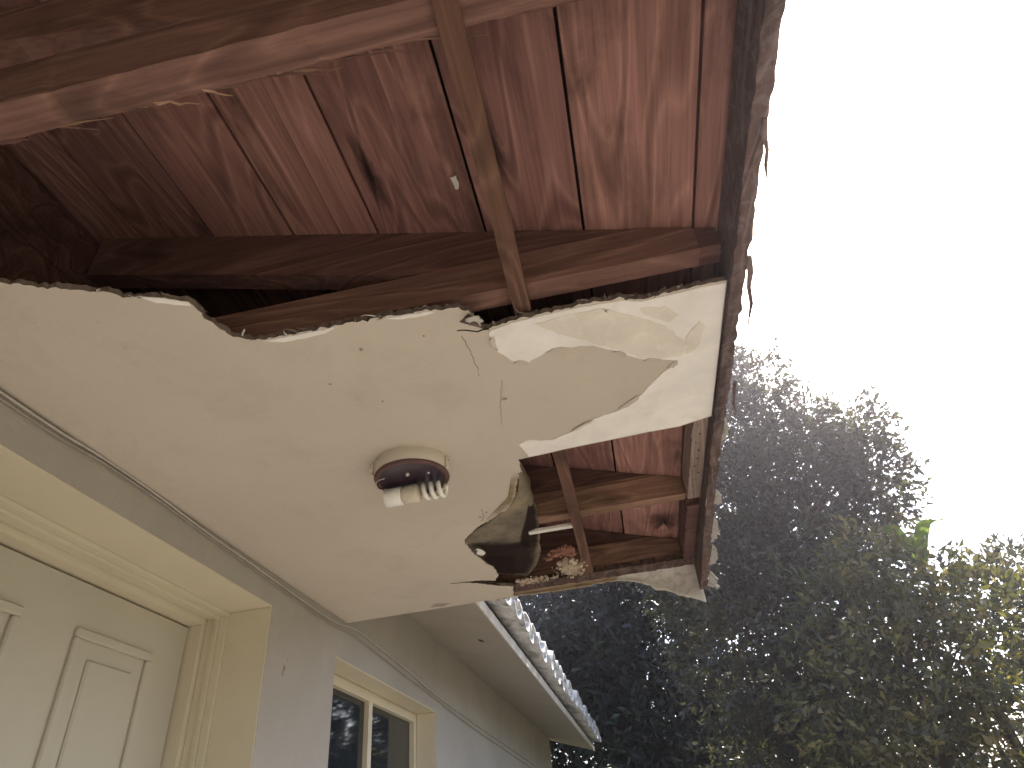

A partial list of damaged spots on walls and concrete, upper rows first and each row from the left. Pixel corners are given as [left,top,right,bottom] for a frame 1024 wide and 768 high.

spalling [141,296,191,306]
spalling [262,327,335,342]
spalling [384,311,435,320]
crack [457,313,489,376]
peeling [489,282,726,457]
spalling [498,518,720,602]